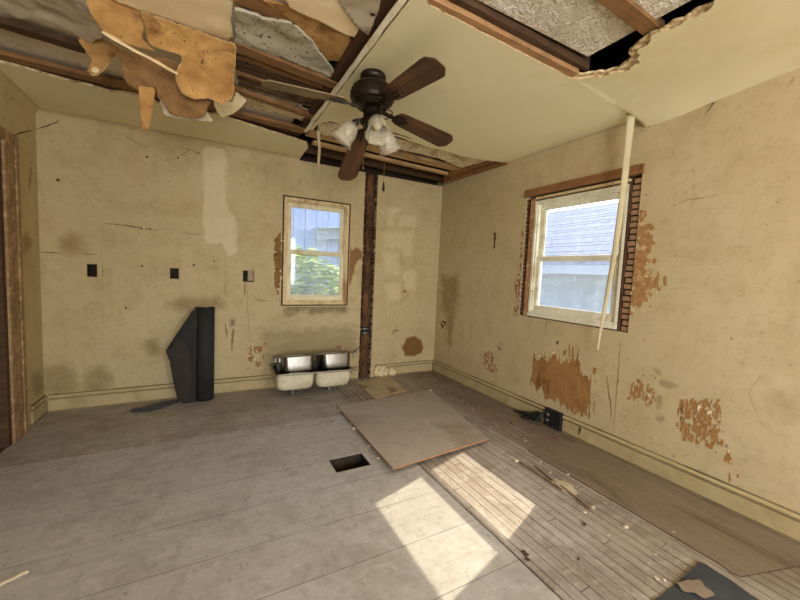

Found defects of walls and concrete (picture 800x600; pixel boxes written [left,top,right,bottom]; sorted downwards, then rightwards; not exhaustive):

flaking render [273,232,284,297]
flaking render [630,210,667,315]
peeling [247,341,269,368]
peeling [530,341,597,419]
peeling [624,379,656,406]
peeling [676,398,739,482]